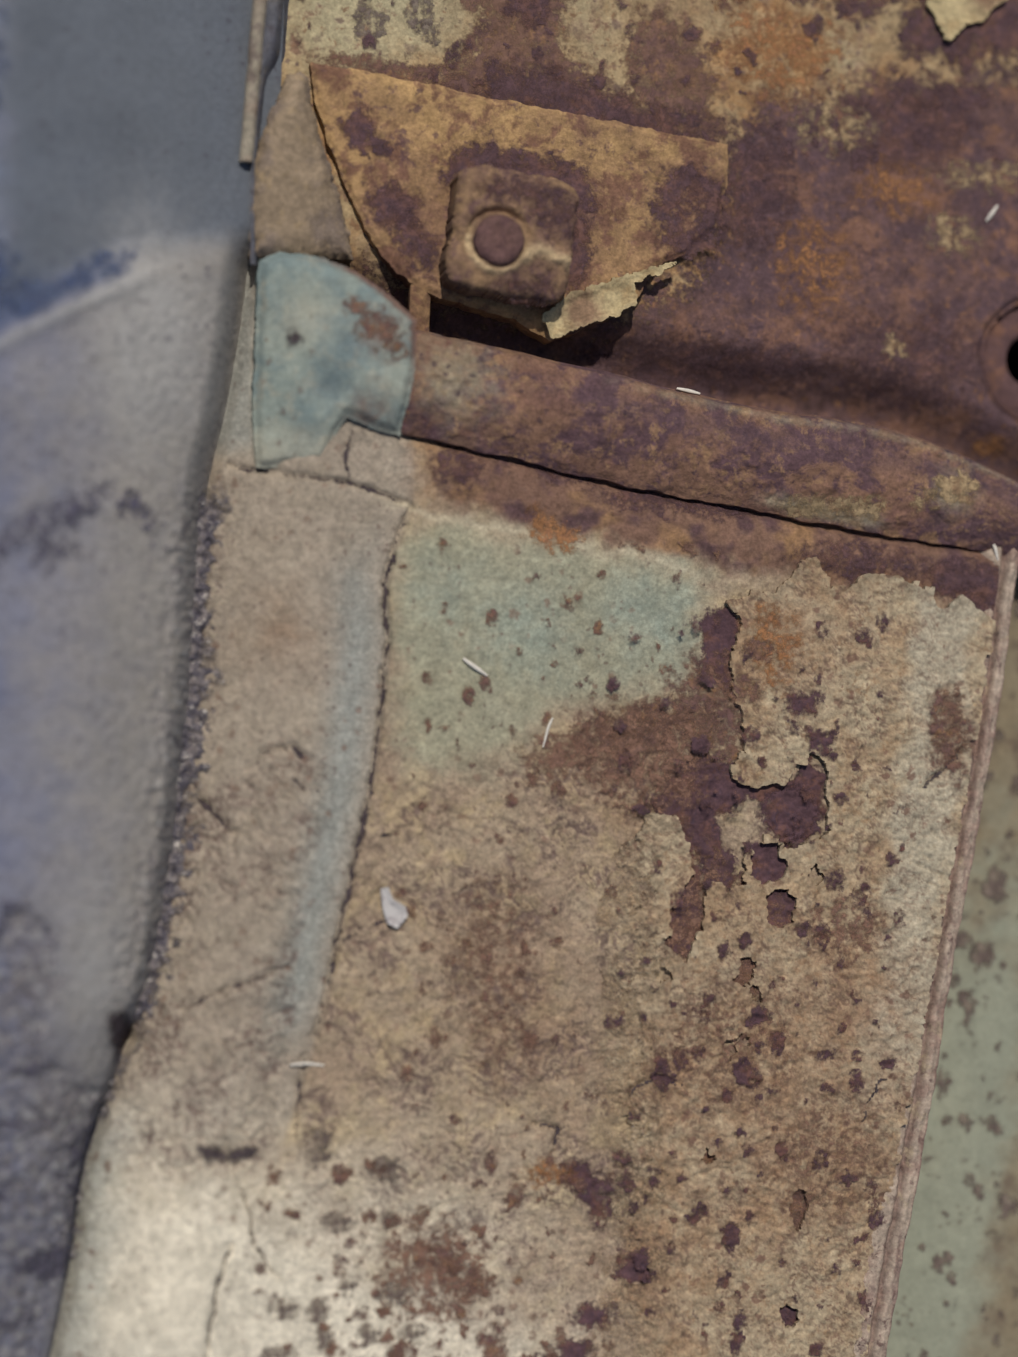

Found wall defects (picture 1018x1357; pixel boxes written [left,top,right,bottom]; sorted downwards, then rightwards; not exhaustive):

peeling [925,0,1007,42]
damp [0,244,136,317]
peeling [541,261,677,340]
rust [297,0,1018,482]
crack [239,430,406,1136]
rust [505,604,862,817]
peeling [529,556,996,1357]
rust [638,976,836,1113]
crack [206,1194,273,1348]
rust [255,1128,505,1357]
spalling [476,1322,508,1357]
rust [692,1210,754,1354]